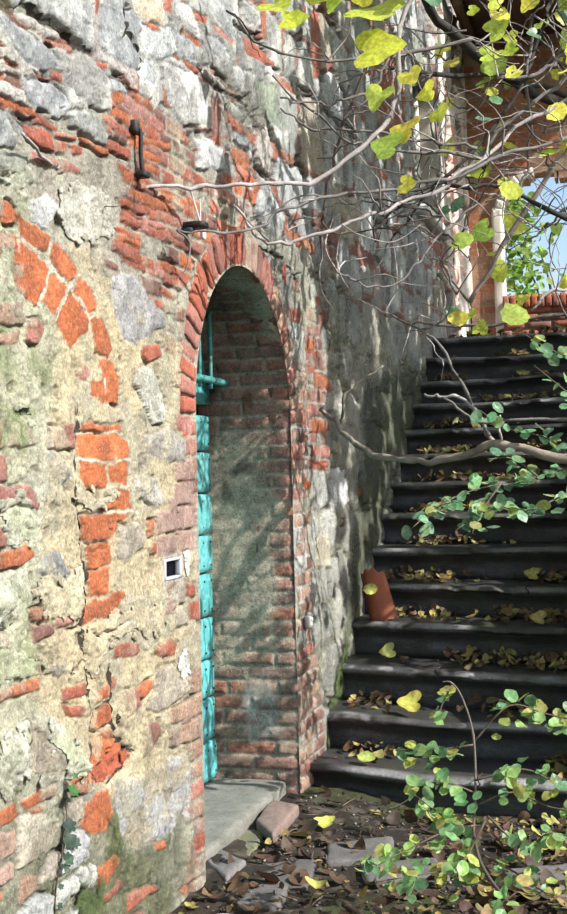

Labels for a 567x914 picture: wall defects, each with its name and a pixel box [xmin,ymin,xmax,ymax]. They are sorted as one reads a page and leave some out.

crack [67,404,134,783]